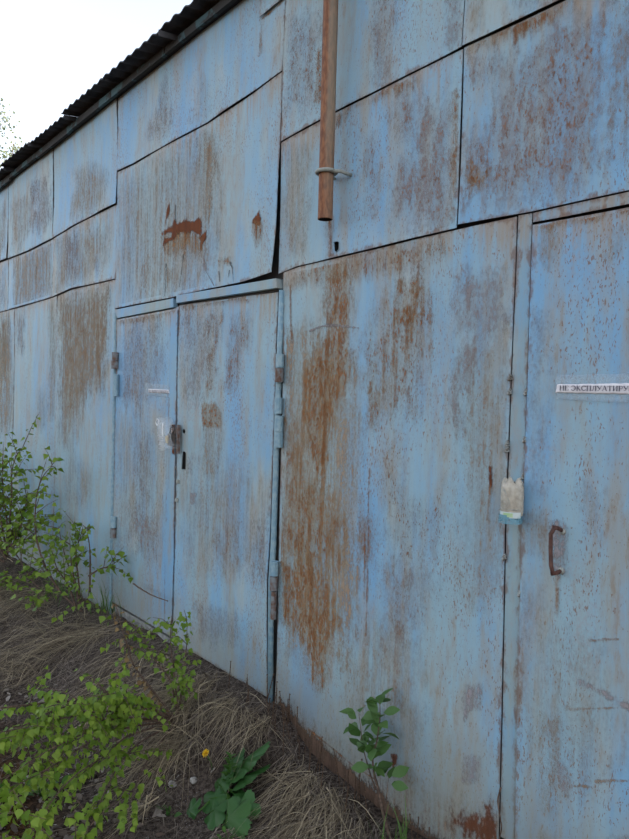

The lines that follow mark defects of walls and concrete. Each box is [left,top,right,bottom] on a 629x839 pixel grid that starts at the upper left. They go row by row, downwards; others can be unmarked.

corrosion [123,142,215,296]
corrosion [252,211,261,242]
corrosion [49,287,109,432]
corrosion [201,403,221,474]
corrosion [280,241,442,687]
corrosion [422,804,497,839]